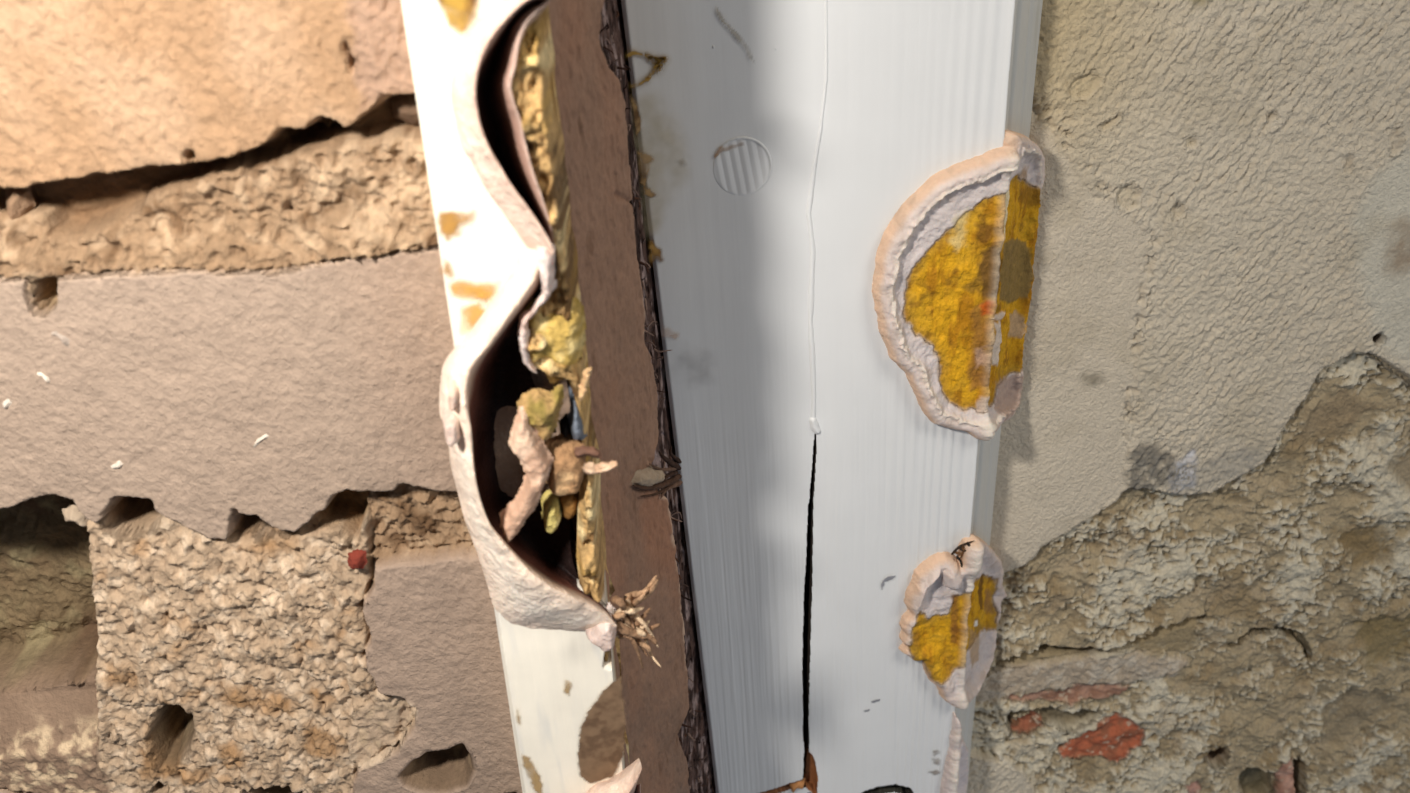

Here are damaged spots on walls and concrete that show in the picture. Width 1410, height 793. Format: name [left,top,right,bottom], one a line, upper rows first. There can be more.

spalling [227,489,372,569]
spalling [970,332,1410,793]
crack [760,434,817,793]
peeling [523,756,542,793]
crack [862,784,913,793]